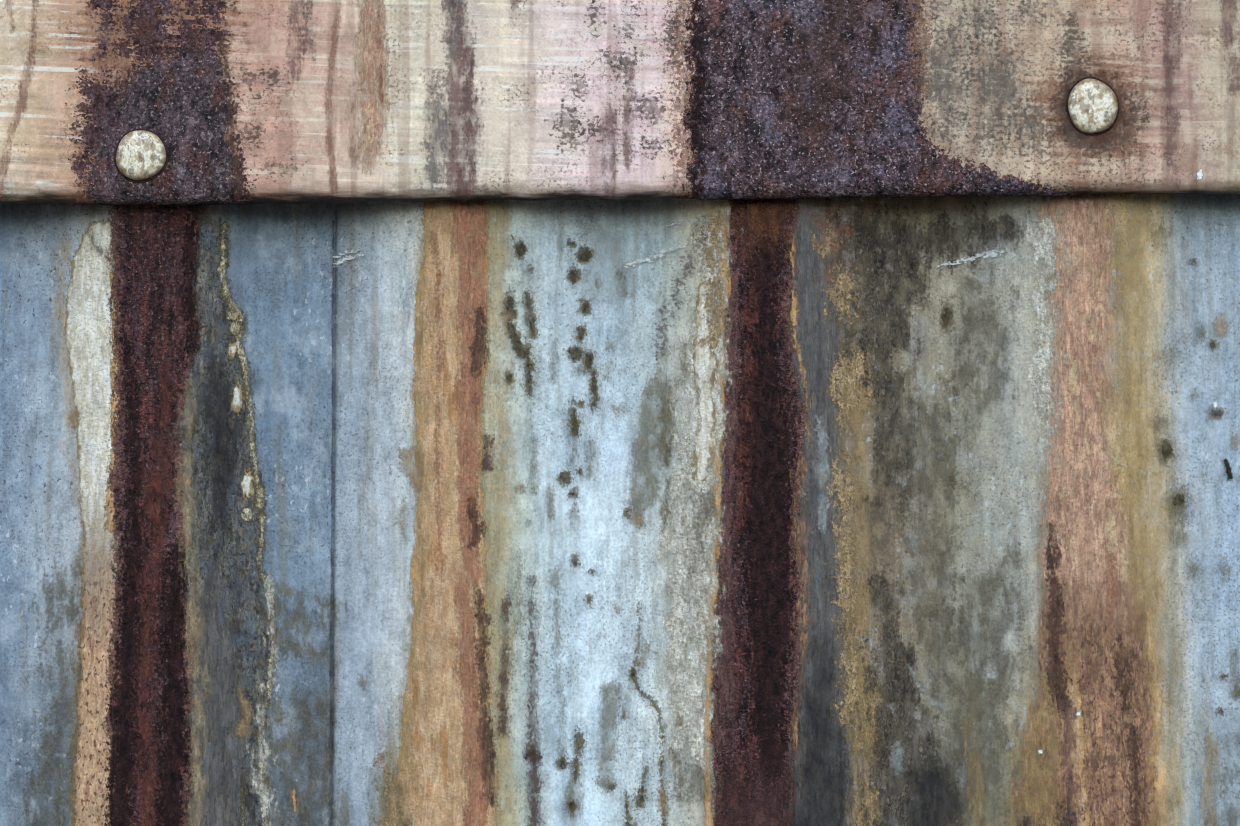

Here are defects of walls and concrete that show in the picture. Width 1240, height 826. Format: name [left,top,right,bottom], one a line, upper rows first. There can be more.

corrosion [65,0,257,826]
corrosion [373,0,499,826]
leakage [855,564,963,826]
corrosion [663,0,1182,826]
corrosion [1170,485,1201,576]
corrosion [1218,650,1240,697]